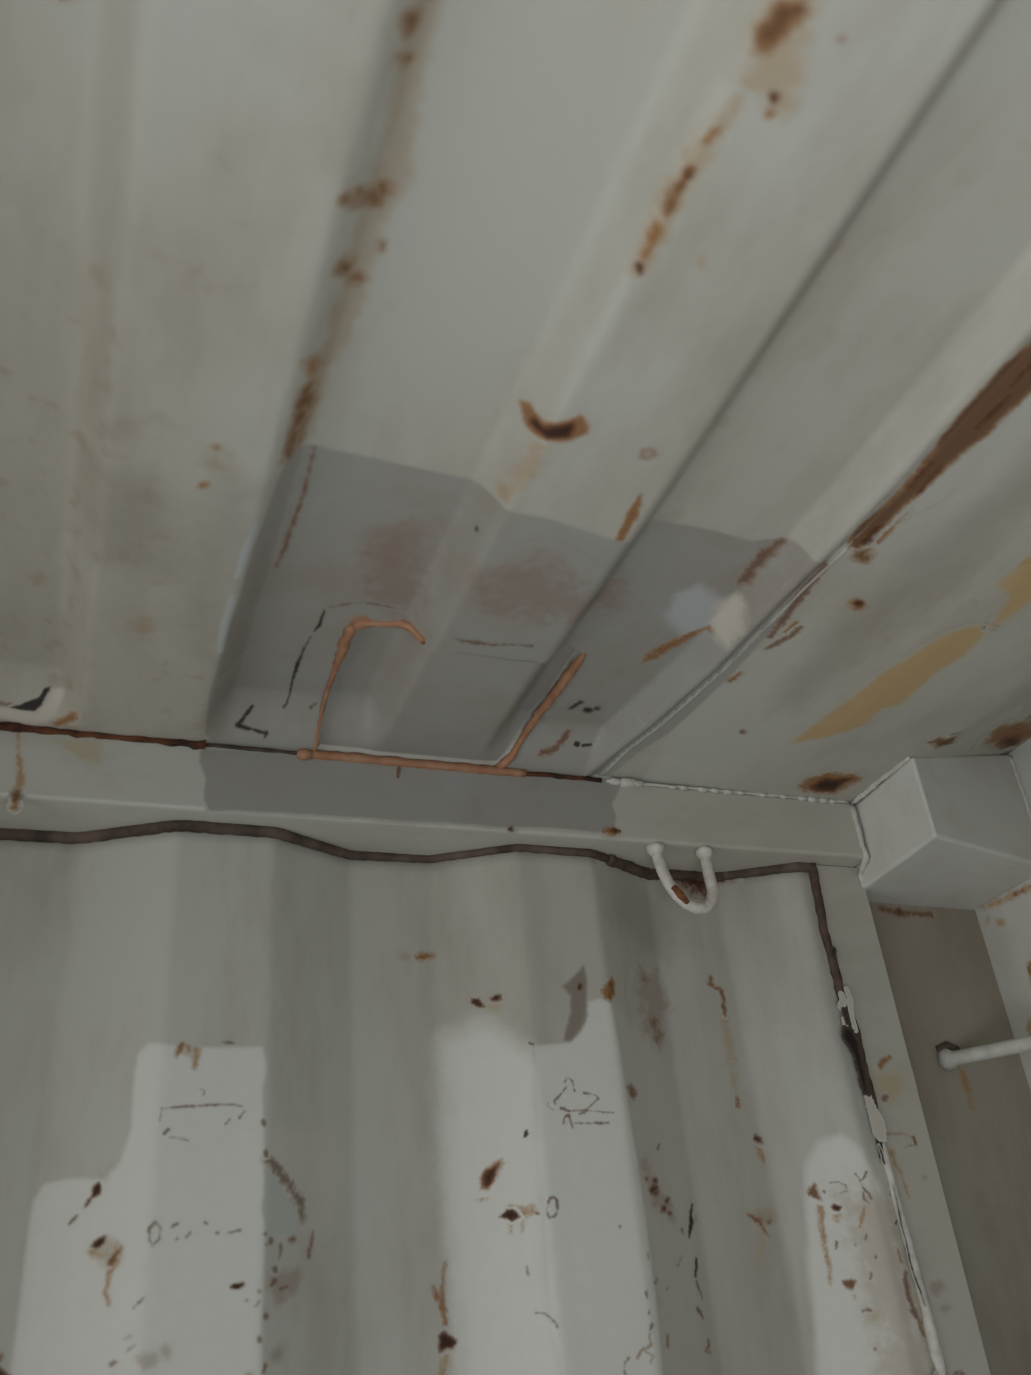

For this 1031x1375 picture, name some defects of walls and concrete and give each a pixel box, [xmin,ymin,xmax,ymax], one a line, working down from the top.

rust [615,0,842,288]
rust [267,0,457,474]
rust [486,392,597,511]
rust [759,336,1031,654]
rust [790,769,868,798]
rust [921,713,1031,755]
rust [469,1154,543,1238]